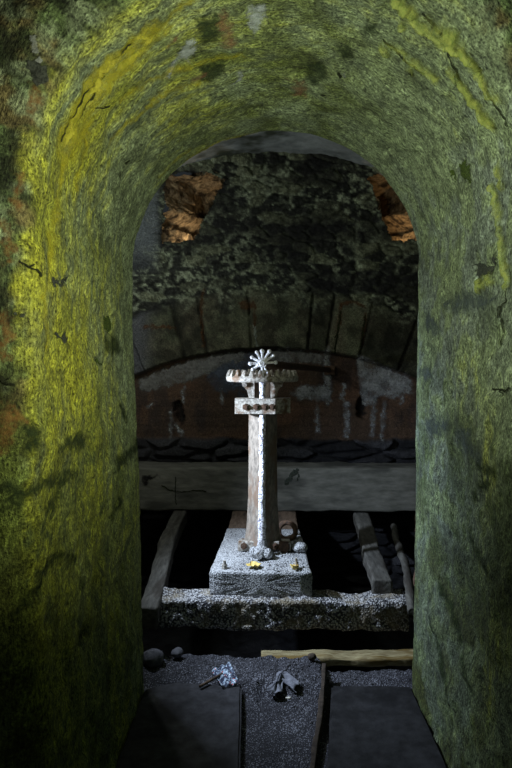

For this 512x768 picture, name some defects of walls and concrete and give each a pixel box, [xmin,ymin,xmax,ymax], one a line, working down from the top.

crack [61,44,131,142]
crack [383,40,424,74]
crack [422,13,507,129]
damp [297,350,350,438]
damp [357,357,411,441]